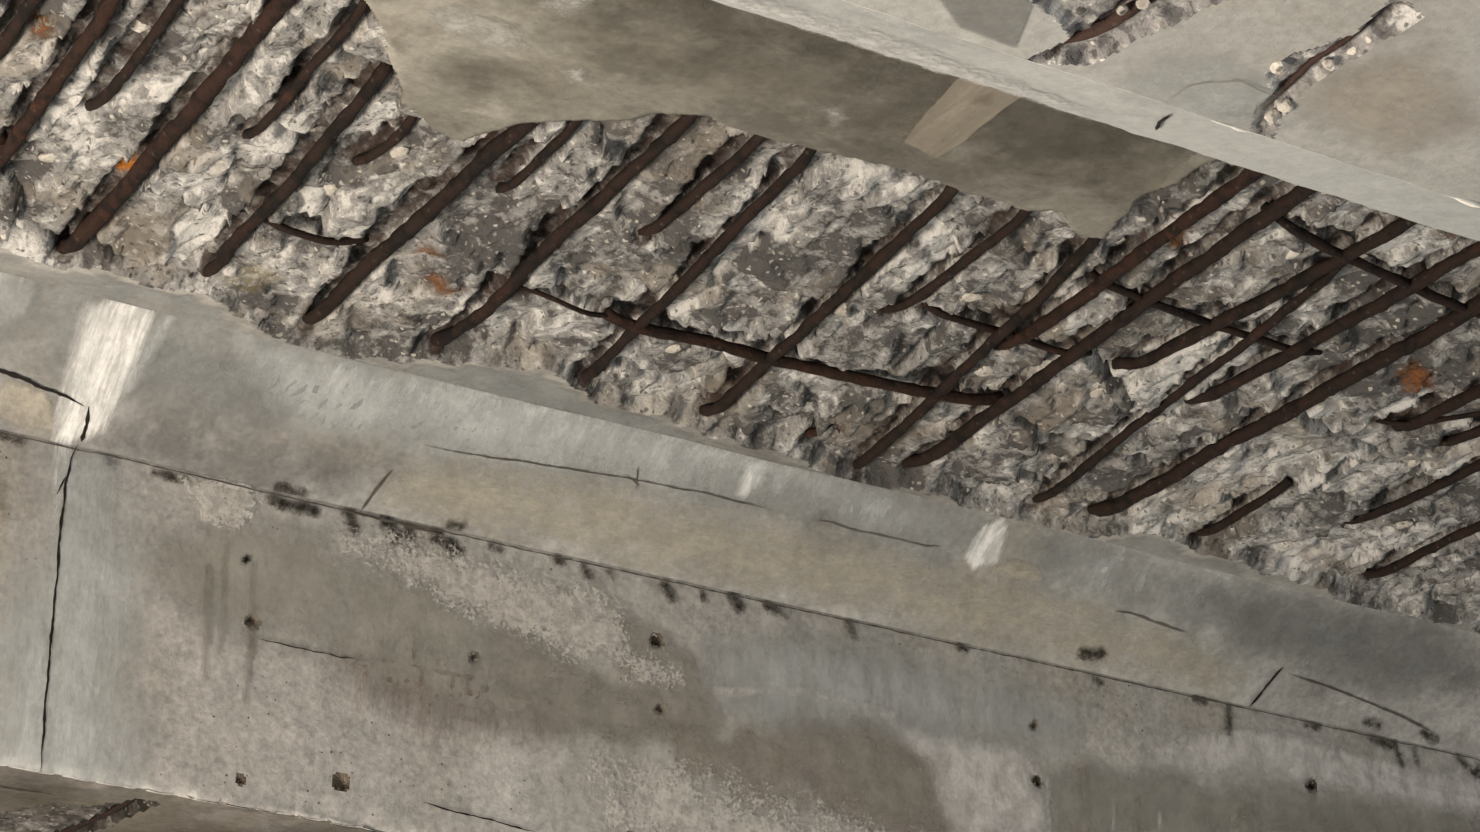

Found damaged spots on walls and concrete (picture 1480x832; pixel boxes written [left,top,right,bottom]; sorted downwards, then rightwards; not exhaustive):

rust [115,158,135,170]
spalling [0,0,1480,634]
rust [1397,363,1434,394]
water stain [738,461,765,498]
water stain [0,277,726,782]
crack [0,369,1480,794]
peeling [332,528,685,689]
spalling [0,798,160,832]
crack [208,801,374,832]
crack [425,802,535,832]